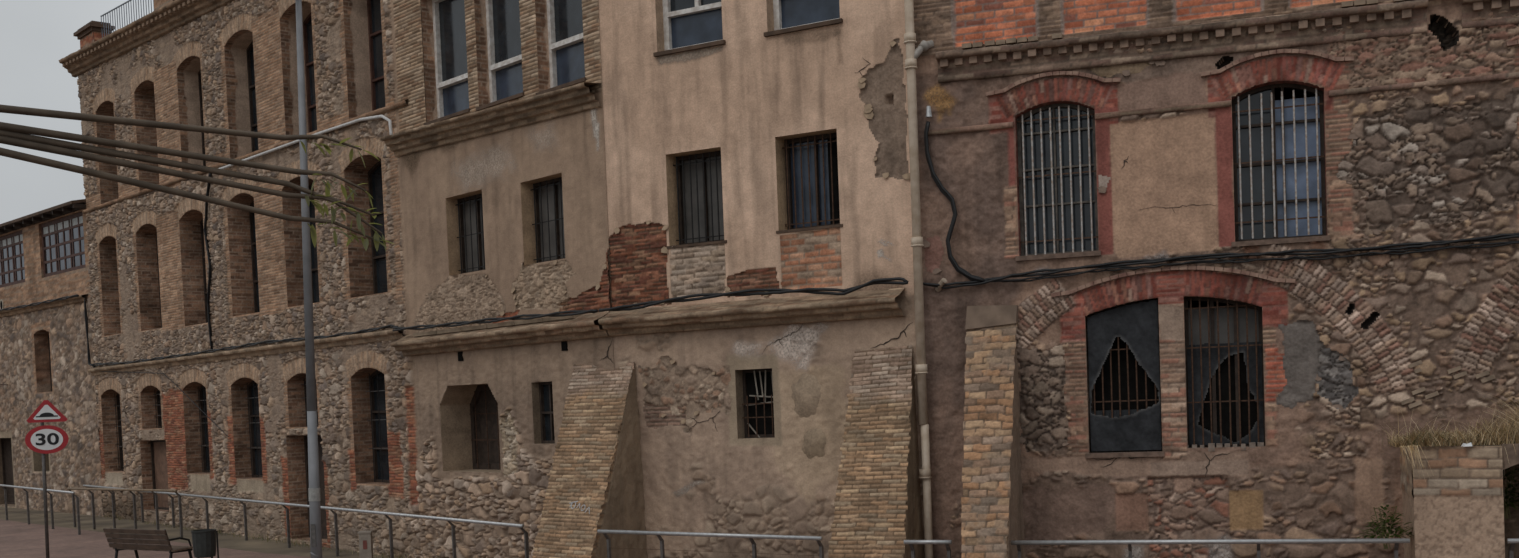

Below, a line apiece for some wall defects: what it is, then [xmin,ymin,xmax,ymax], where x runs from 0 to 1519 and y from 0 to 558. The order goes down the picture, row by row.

spalling [1428,14,1459,51]
flaking render [858,38,910,180]
flaking render [414,221,842,333]
spalling [1345,303,1380,329]